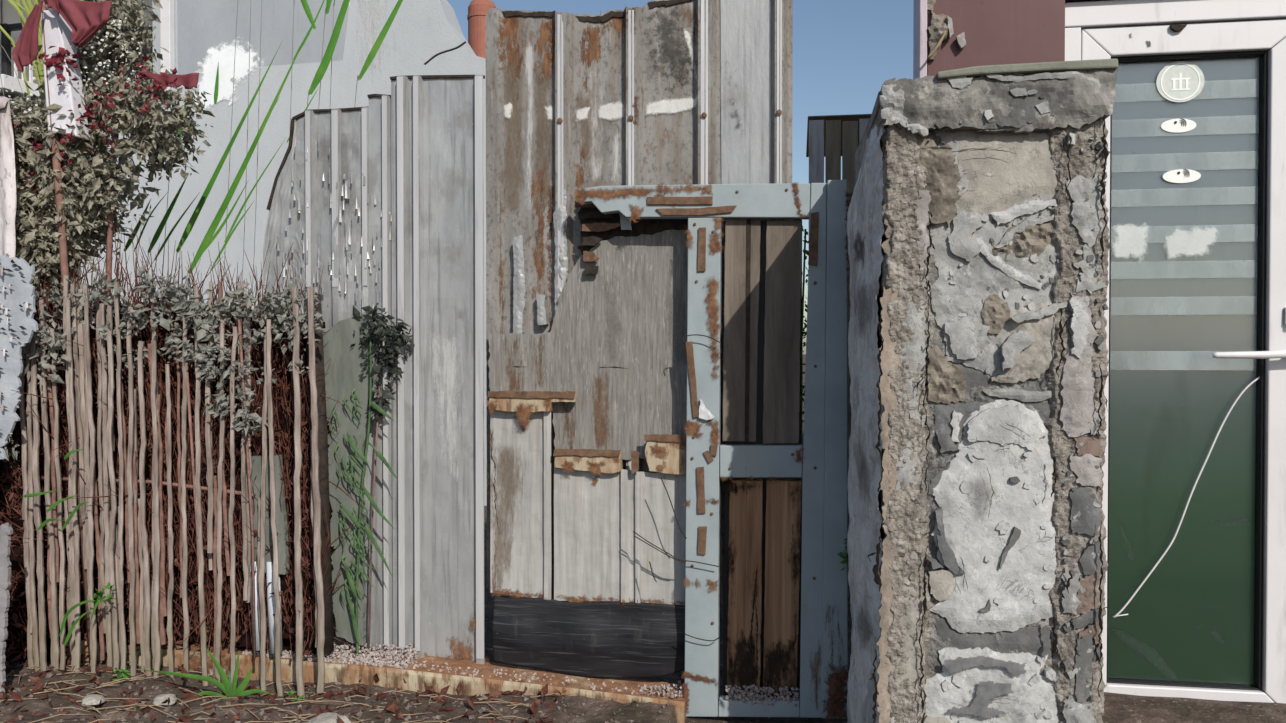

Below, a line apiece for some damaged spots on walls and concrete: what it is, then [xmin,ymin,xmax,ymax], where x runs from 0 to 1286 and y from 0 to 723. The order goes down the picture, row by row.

corrosion [497,16,555,322]
corrosion [574,8,712,222]
spalling [927,0,966,62]
corrosion [499,244,620,486]
corrosion [651,420,720,471]
corrosion [705,276,722,379]
crack [875,314,884,492]
crack [917,211,935,490]
flaking render [876,80,1110,723]
crack [867,537,882,592]
corrosion [673,672,716,715]
crack [869,650,877,723]